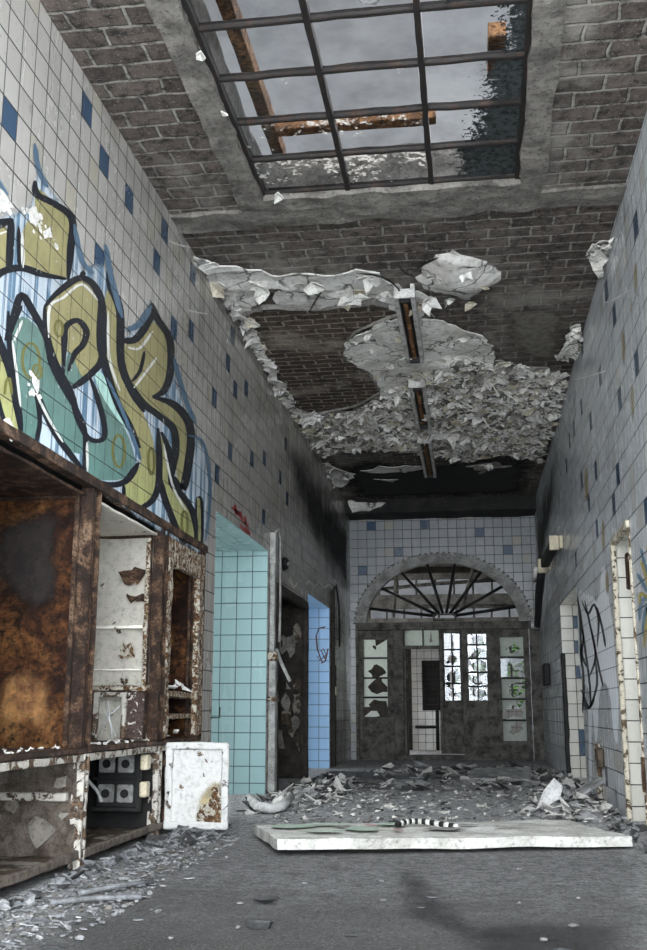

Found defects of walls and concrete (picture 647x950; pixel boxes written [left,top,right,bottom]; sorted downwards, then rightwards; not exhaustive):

peeling [193,256,584,489]
rust [0,513,57,606]
rust [2,679,44,721]
peeling [0,768,32,784]
peeling [54,776,67,789]
rust [197,784,228,823]
peeling [27,811,70,849]